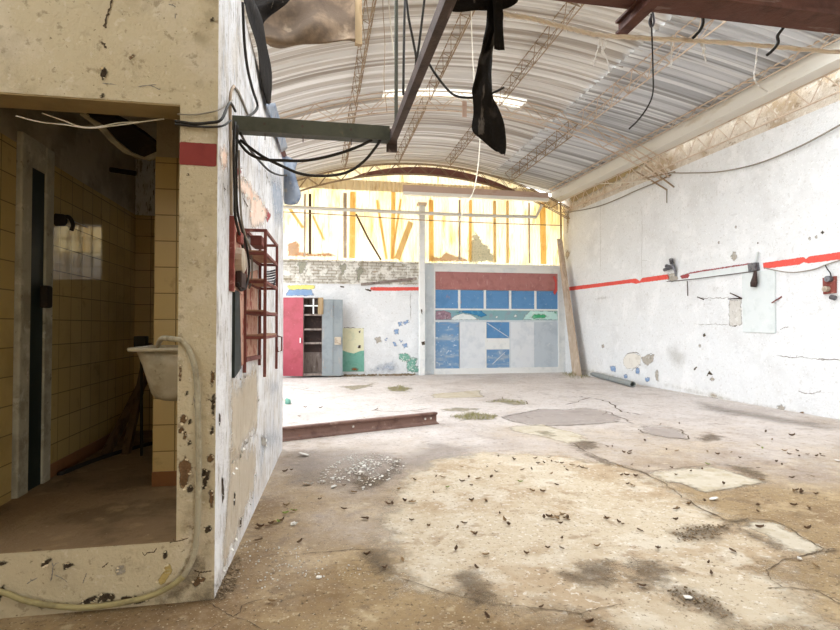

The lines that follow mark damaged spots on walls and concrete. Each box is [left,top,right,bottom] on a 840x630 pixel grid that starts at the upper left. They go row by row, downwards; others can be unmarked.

crack [101,0,113,48]
peeling [238,168,271,229]
flaking render [729,299,742,326]
flaking render [610,353,659,382]
peeling [178,372,267,572]
crack [486,396,840,604]
peeling [155,551,172,585]
flaking render [81,593,149,605]